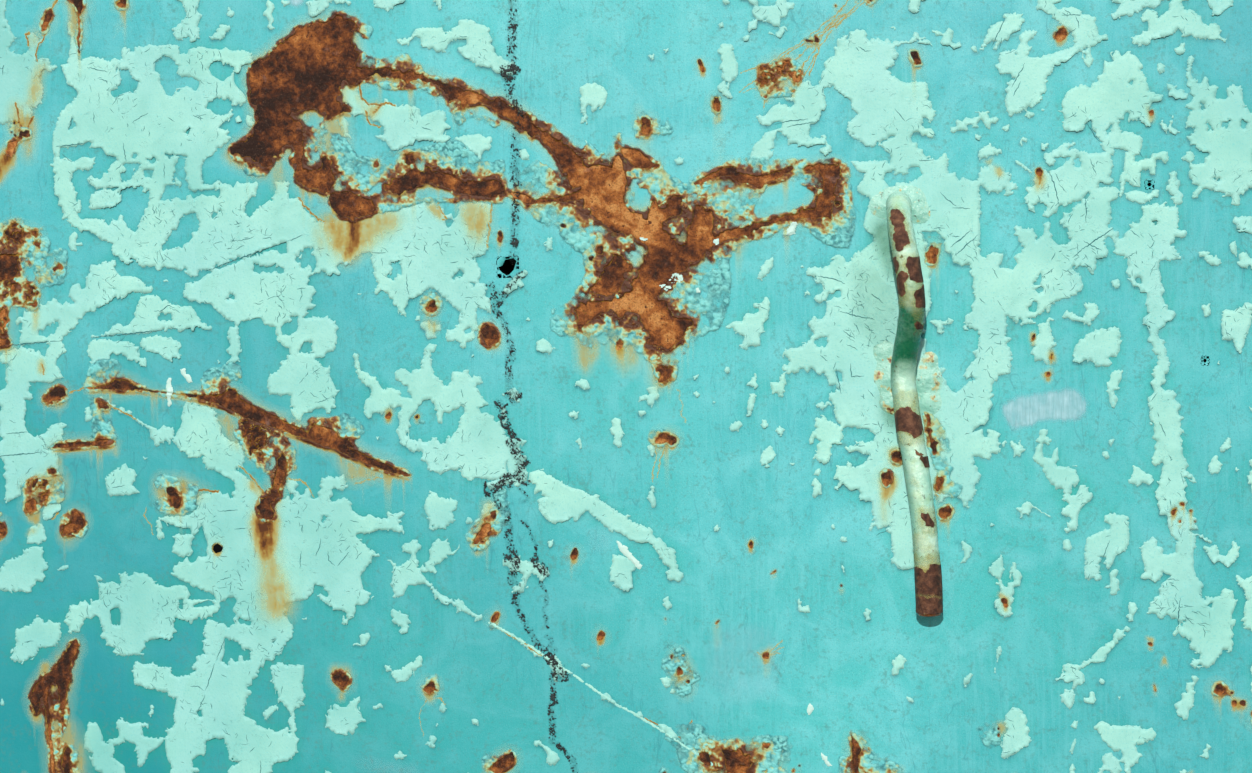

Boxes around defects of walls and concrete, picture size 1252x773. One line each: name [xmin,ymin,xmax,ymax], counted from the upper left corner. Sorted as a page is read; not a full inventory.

peeling [717,0,795,99]
rust [228,11,856,387]
rust [0,219,68,351]
peeling [0,0,684,773]
peeling [726,0,1252,773]
rust [0,512,8,541]
rust [22,468,88,538]
rust [41,359,411,614]
rust [28,638,81,773]
rust [645,718,800,773]
rust [839,733,902,773]